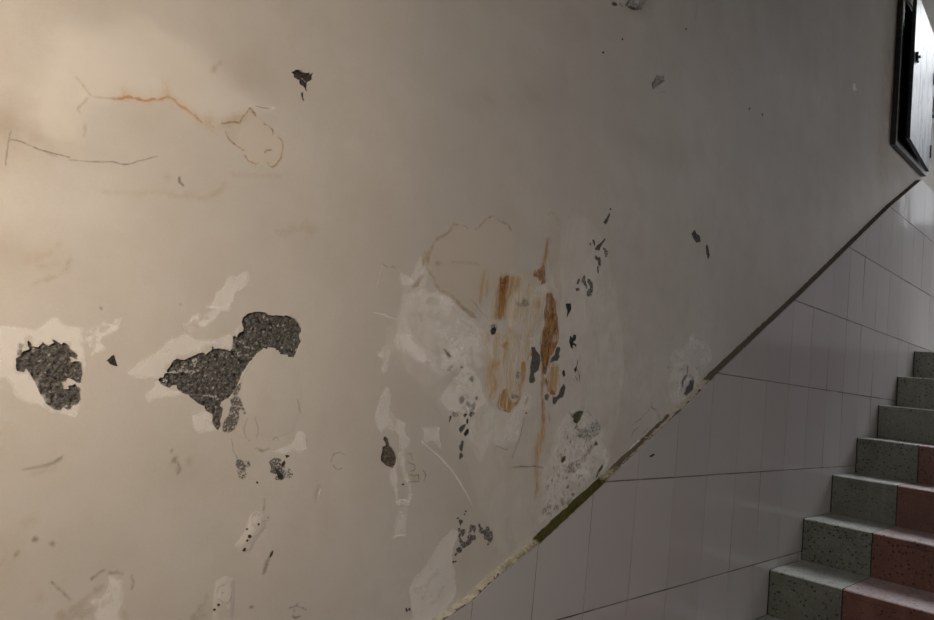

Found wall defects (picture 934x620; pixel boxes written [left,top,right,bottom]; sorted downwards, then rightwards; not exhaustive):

flaking render [292,70,312,101]
peeling [576,238,608,296]
flaking render [16,340,82,410]
flaking render [158,312,301,432]
corrosion [491,247,559,489]
flaking render [516,335,576,383]
flaking render [545,384,565,405]
flaking render [381,437,396,468]
peeling [449,396,478,459]
peeling [452,510,493,563]